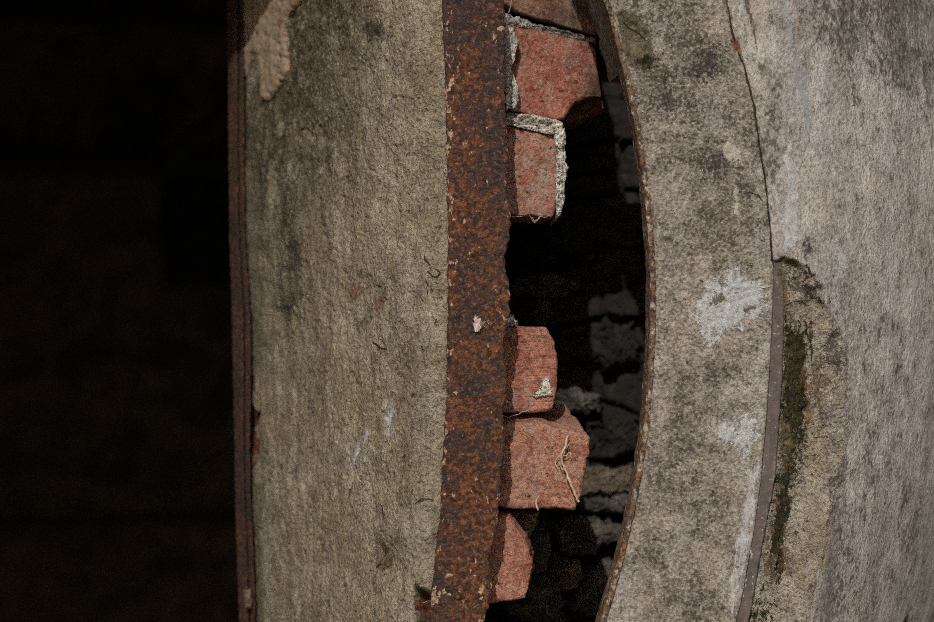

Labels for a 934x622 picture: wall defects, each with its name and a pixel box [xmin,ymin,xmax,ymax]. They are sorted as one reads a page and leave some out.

spalling [563,95,605,130]
crack [726,0,774,264]